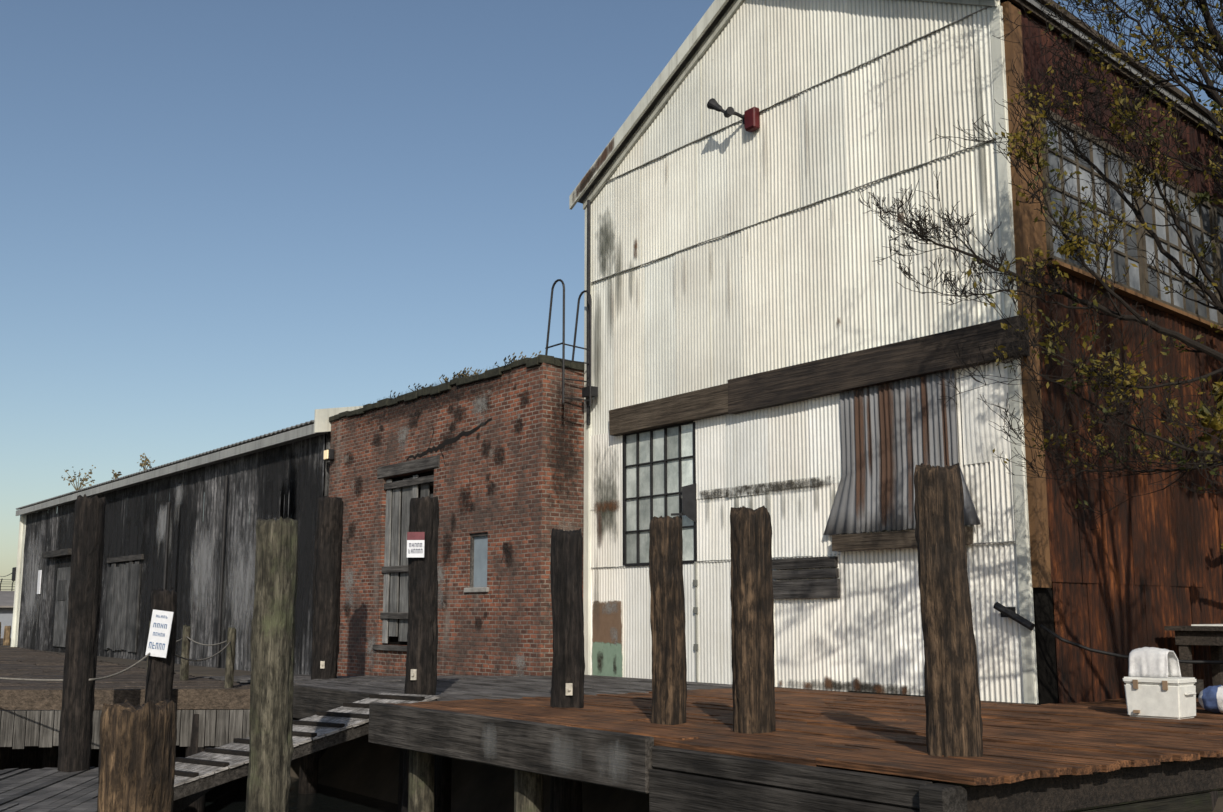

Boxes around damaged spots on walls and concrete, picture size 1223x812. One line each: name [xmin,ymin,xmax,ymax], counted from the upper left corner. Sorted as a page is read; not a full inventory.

damp [595,219,620,378]
damp [357,372,505,423]
crack [406,418,492,465]
damp [548,391,578,502]
damp [596,476,616,531]
rust [854,375,950,524]